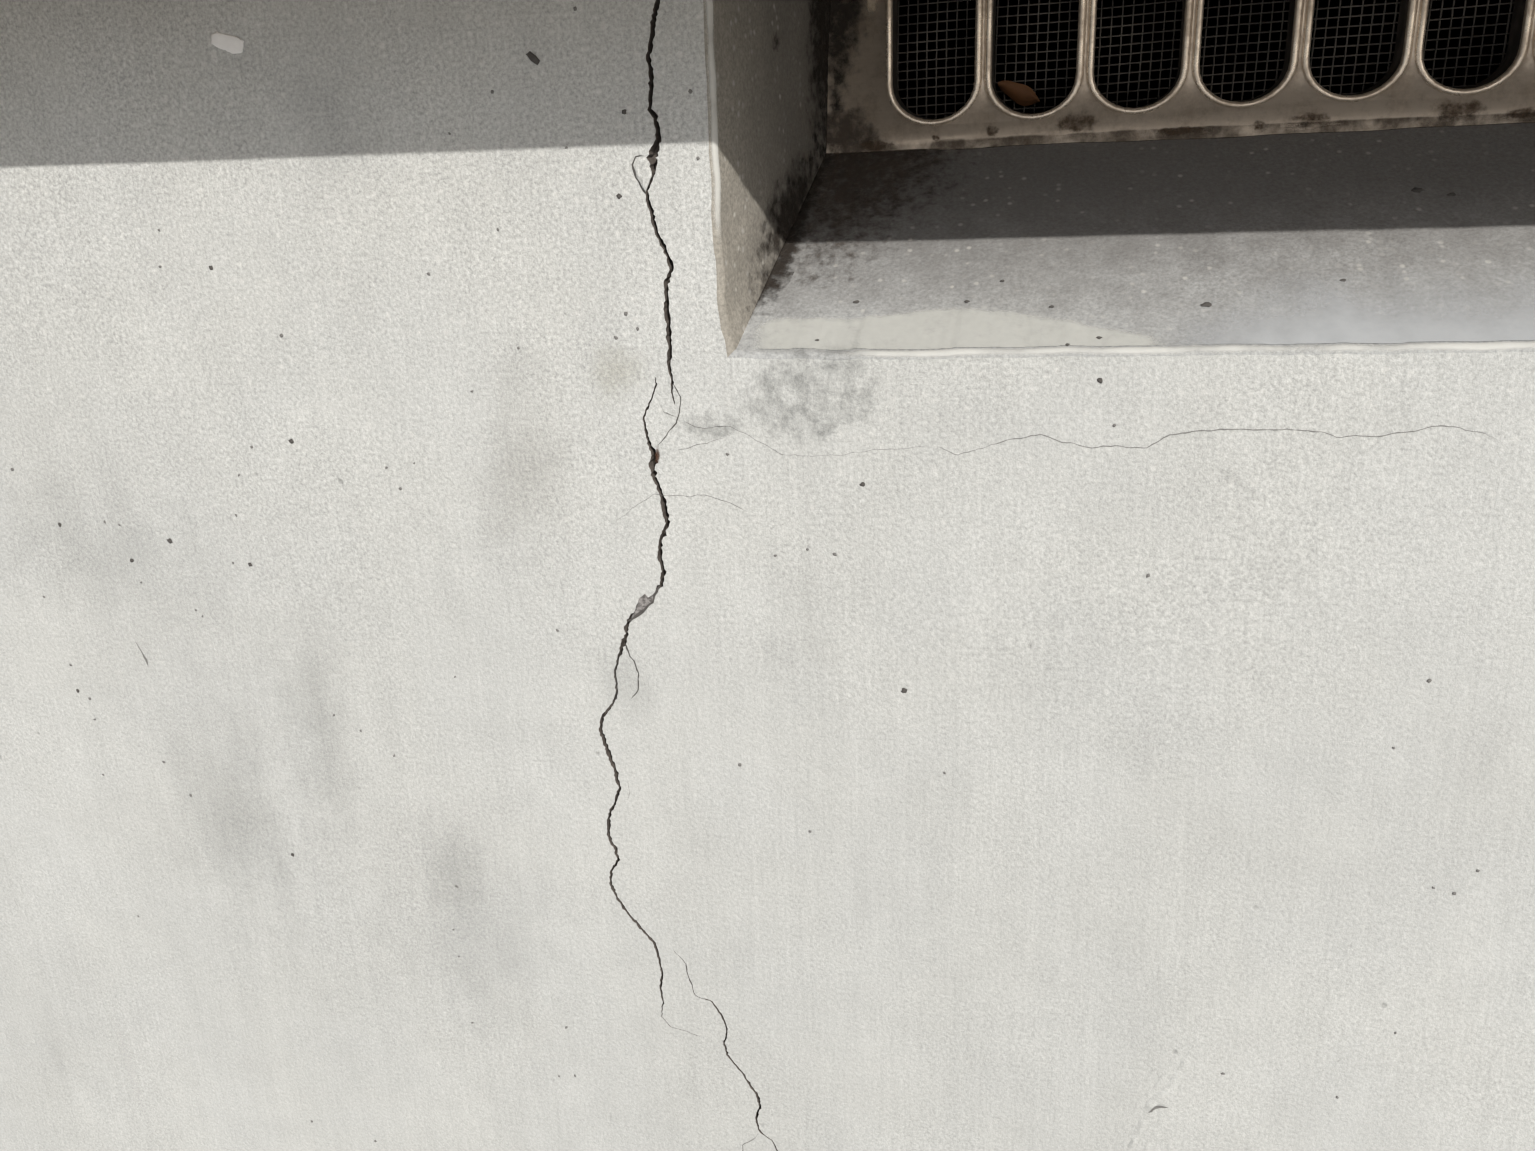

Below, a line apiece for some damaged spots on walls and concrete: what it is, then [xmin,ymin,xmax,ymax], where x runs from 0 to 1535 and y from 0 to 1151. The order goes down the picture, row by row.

damp [756,0,942,305]
damp [761,309,1152,350]
crack [599,0,1485,1151]